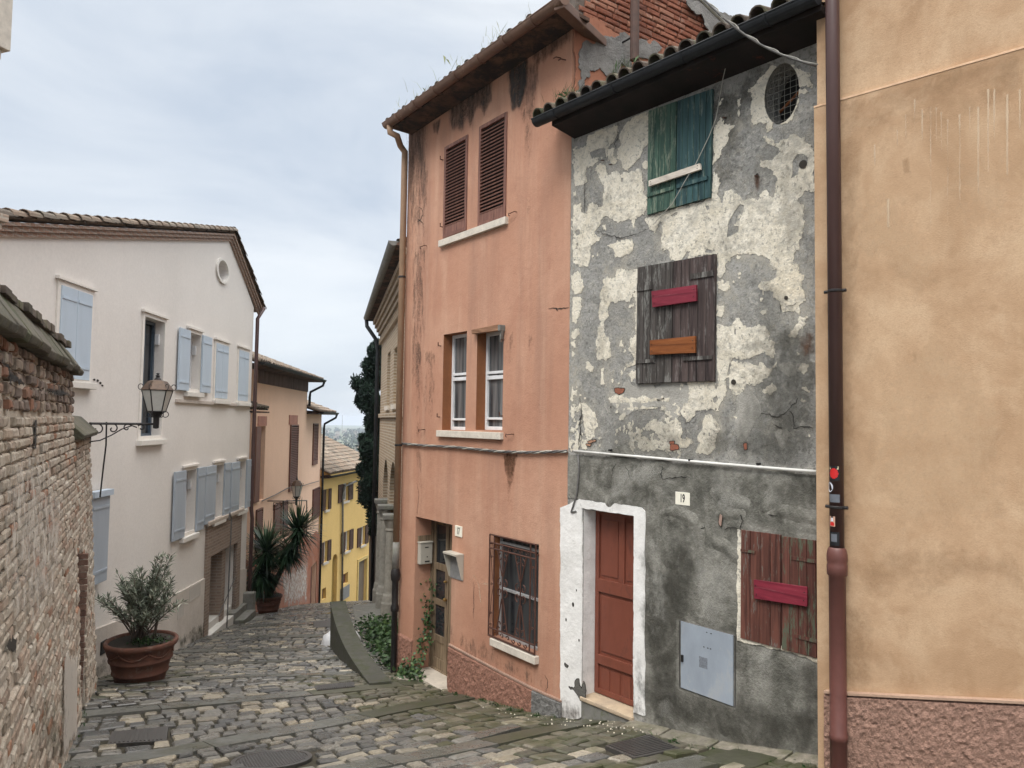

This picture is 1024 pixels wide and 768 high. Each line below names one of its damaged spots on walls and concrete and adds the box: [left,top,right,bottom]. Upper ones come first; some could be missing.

damp [508,32,568,110]
damp [959,89,1021,165]
peeling [569,65,815,459]
crack [761,398,812,429]